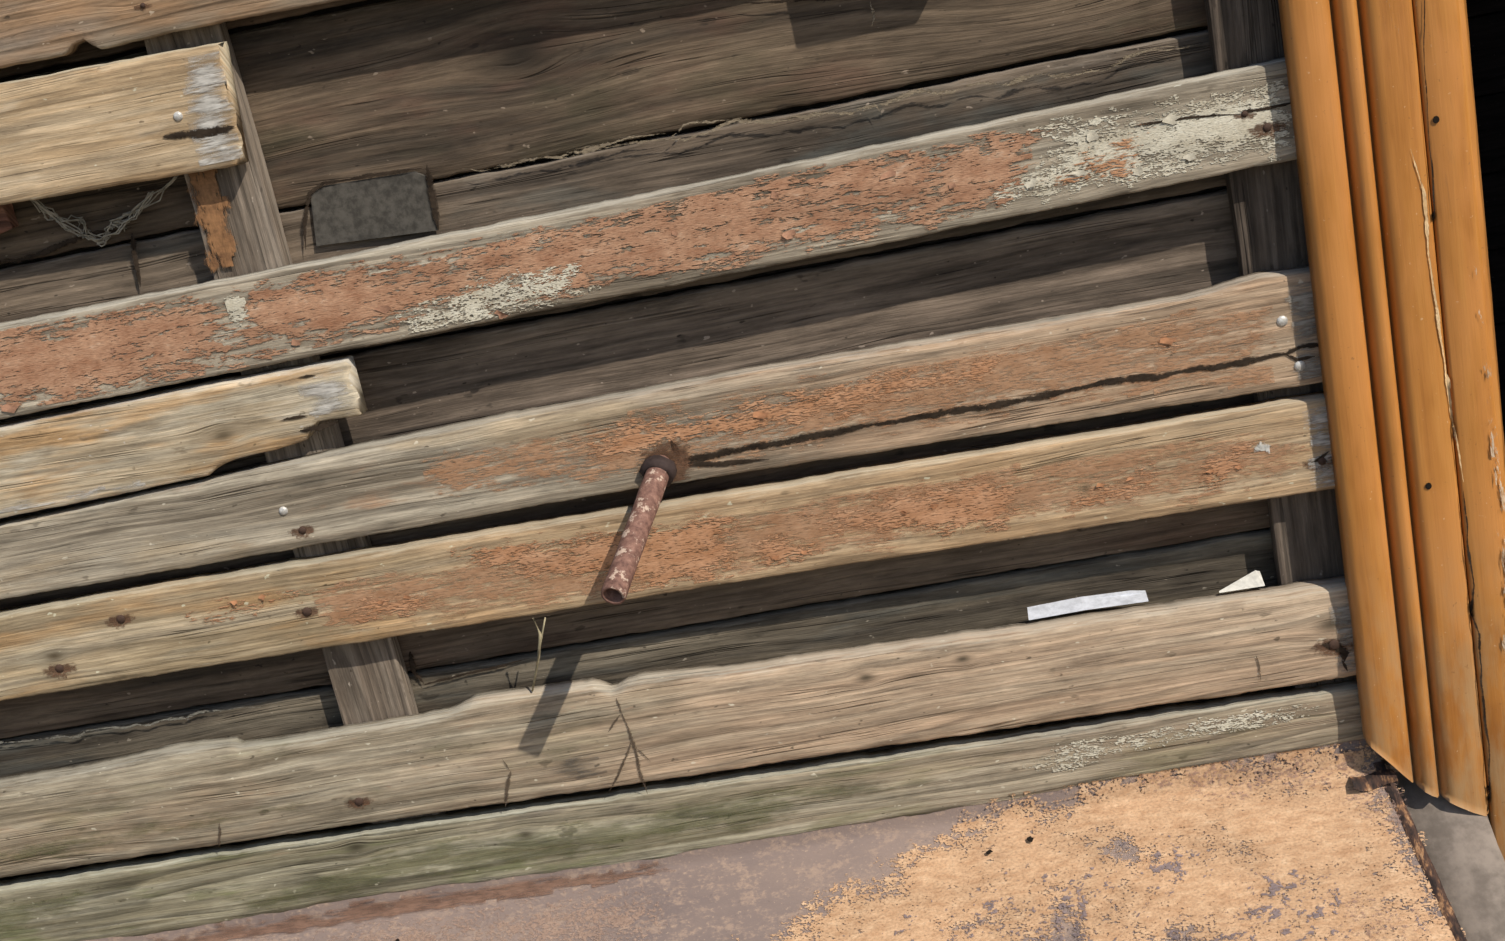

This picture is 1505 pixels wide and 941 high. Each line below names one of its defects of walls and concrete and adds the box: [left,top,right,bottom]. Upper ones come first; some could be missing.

crack [1136,102,1291,126]
crack [1423,0,1435,222]
peeling [0,79,1292,413]
rust [642,442,693,482]
peeling [423,307,1275,494]
crack [671,343,1318,467]